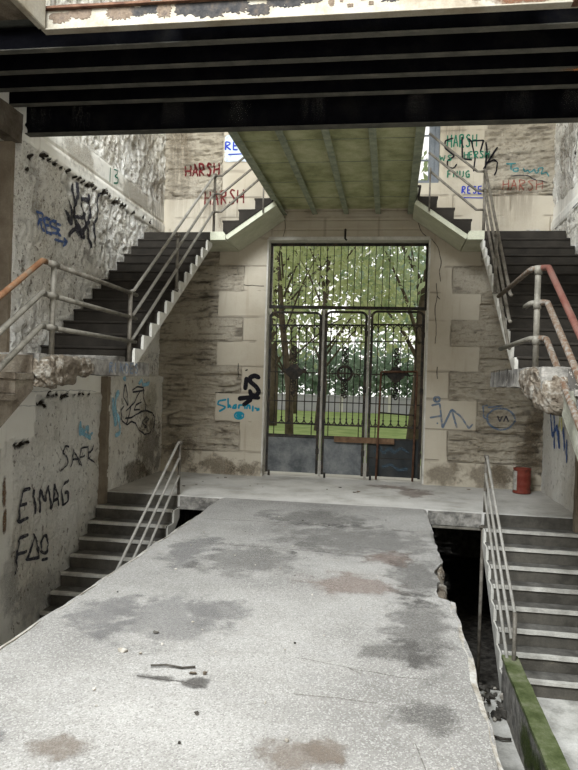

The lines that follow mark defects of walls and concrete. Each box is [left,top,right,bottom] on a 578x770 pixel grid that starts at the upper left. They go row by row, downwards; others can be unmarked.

peeling [49,9,93,24]
peeling [106,0,353,21]
spalling [32,354,95,408]
spalling [437,566,503,770]
leakage [260,739,343,769]